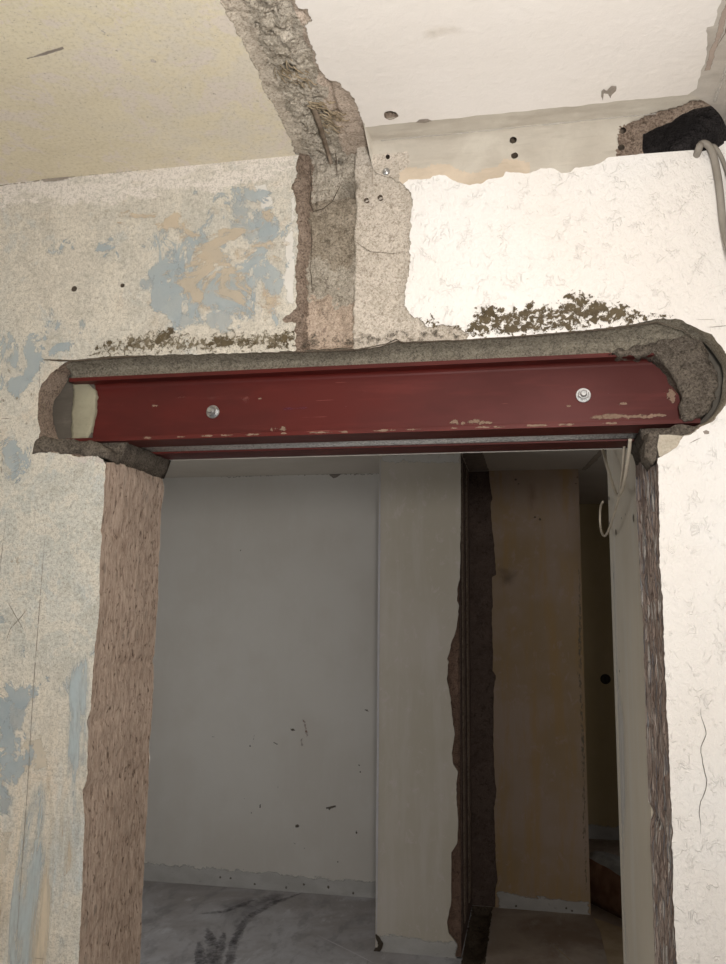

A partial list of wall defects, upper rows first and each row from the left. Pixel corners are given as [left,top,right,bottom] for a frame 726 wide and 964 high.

spalling [118,0,469,353]
peeling [0,321,74,398]
peeling [0,677,48,813]
peeling [9,812,50,964]